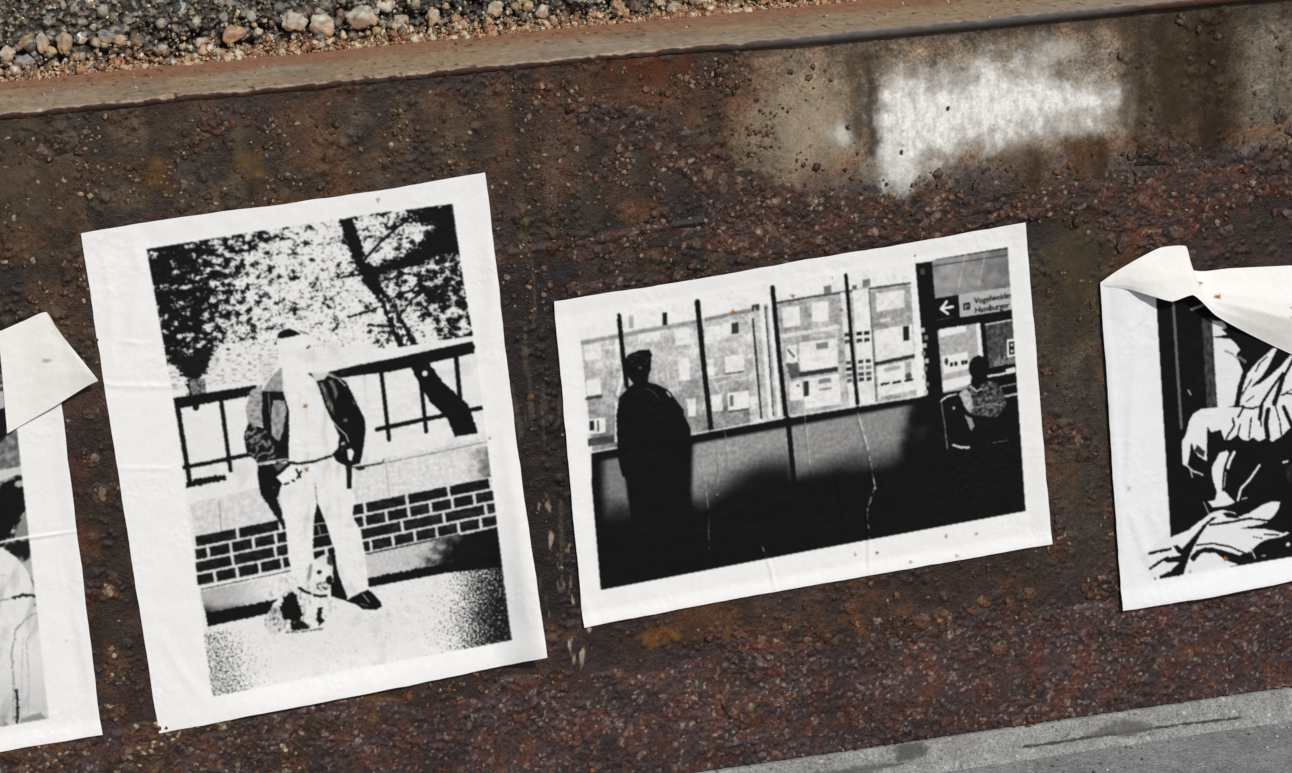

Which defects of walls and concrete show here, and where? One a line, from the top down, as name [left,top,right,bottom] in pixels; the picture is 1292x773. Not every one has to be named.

corrosion [1109,12,1232,80]
leakage [873,42,1120,186]
corrosion [81,451,121,506]
corrosion [1043,423,1111,474]
corrosion [0,514,1292,773]